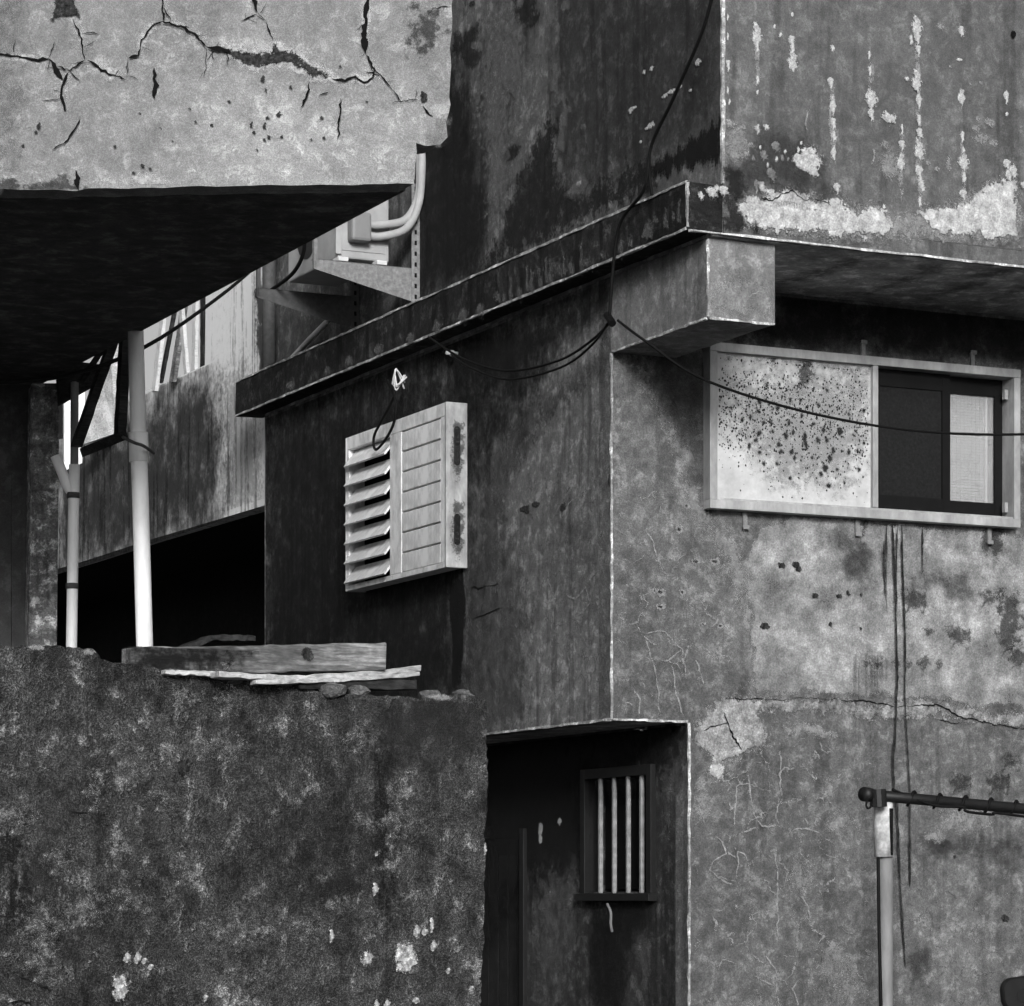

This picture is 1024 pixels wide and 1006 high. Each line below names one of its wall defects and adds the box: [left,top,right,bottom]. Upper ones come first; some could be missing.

crack [0,0,231,150]
crack [242,0,273,39]
crack [301,0,432,138]
leakage [513,0,540,29]
leakage [484,116,760,270]
leakage [495,246,588,302]
crack [471,474,740,718]
leakage [636,359,1024,789]
peeling [694,696,771,821]
crack [697,738,865,1006]
leakage [896,803,911,968]